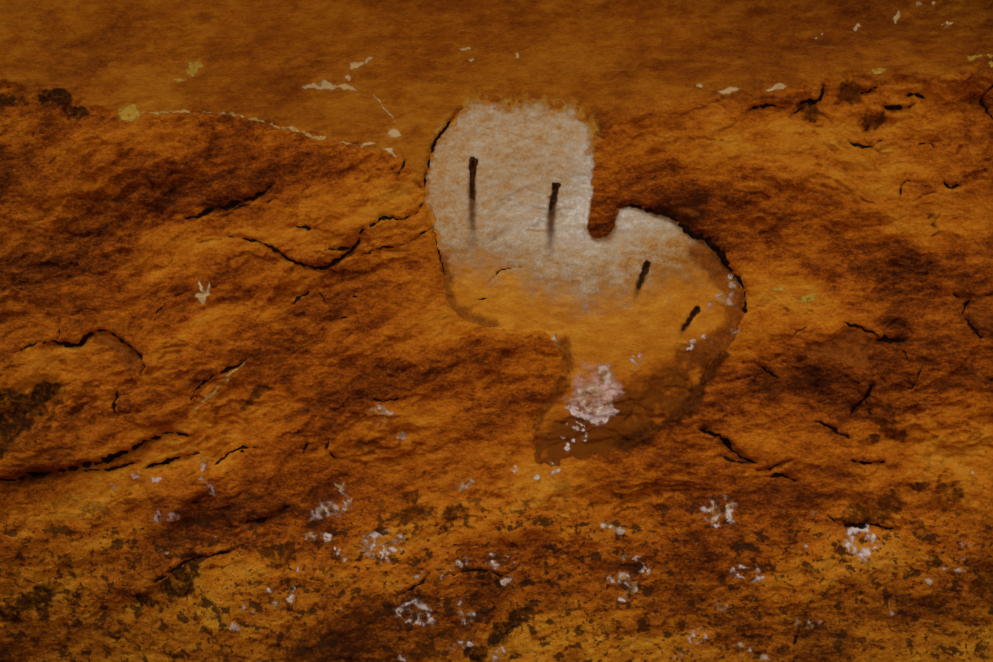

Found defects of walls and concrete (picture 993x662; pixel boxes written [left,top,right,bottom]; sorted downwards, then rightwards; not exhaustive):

crack [185,185,283,219]
crack [229,111,459,319]
rust [548,195,556,236]
spalling [423,95,745,466]
crack [17,329,145,372]
crack [111,391,119,413]
damp [561,365,622,451]
crack [0,432,257,482]